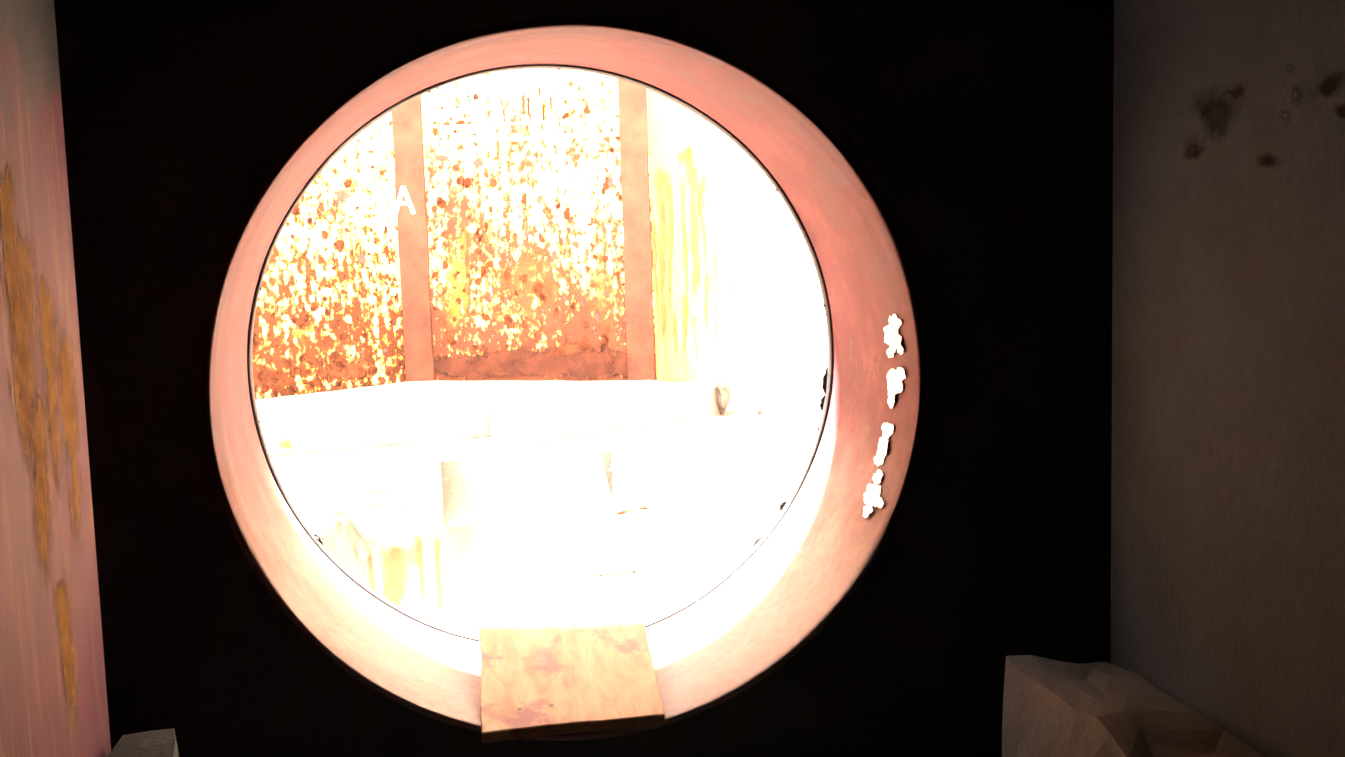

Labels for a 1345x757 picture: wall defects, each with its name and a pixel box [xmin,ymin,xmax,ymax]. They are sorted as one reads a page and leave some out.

rust [252,155,402,399]
rust [431,87,628,381]
rust [653,146,718,359]
peeling [863,314,906,518]